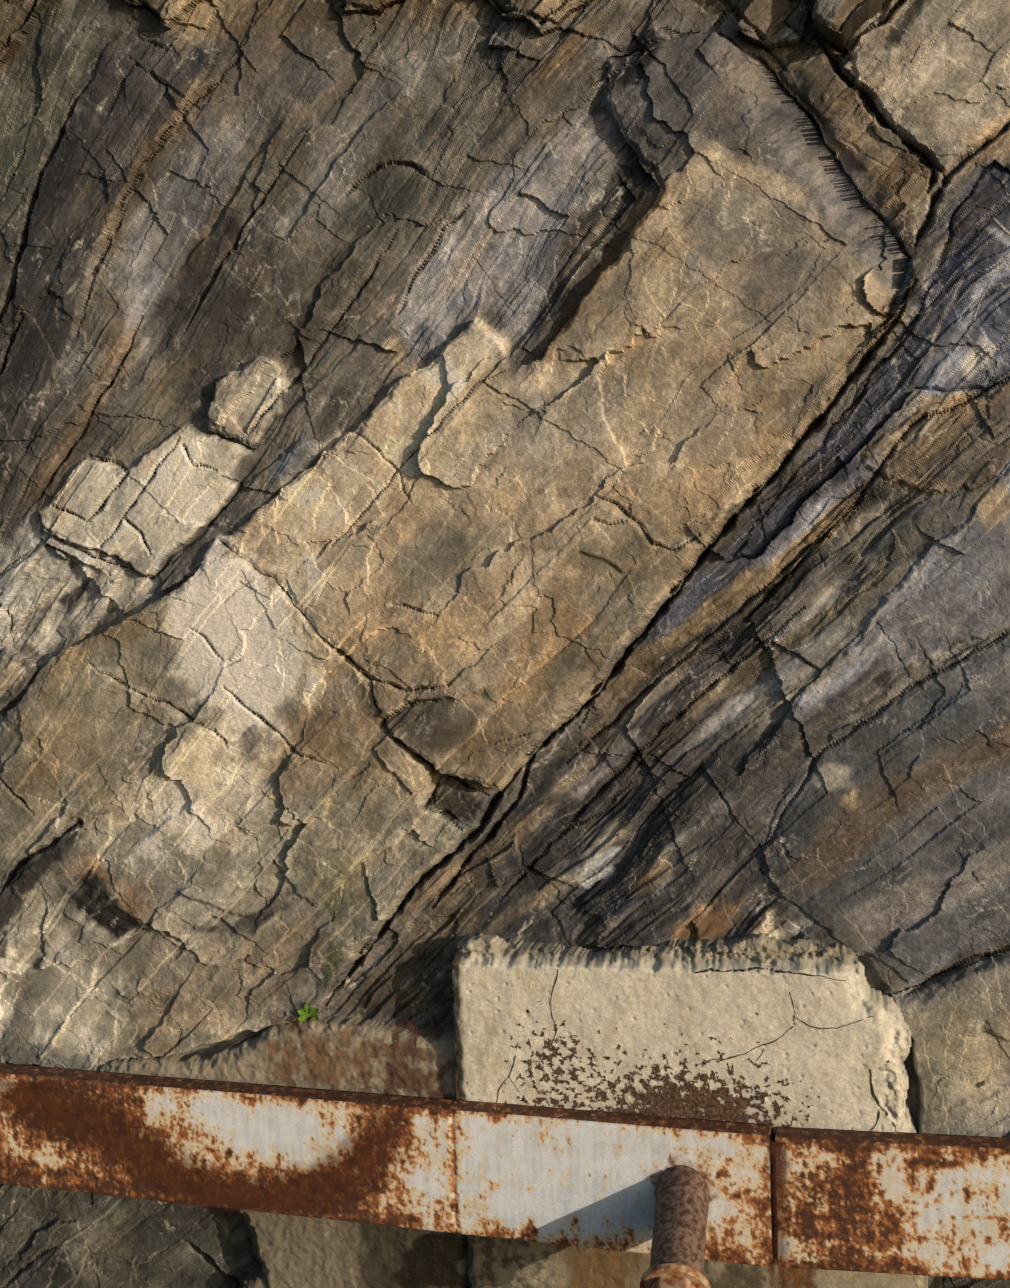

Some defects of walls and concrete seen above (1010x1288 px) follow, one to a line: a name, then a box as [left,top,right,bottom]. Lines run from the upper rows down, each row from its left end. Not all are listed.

corrosion [567,1246,641,1288]
corrosion [769,1142,814,1288]